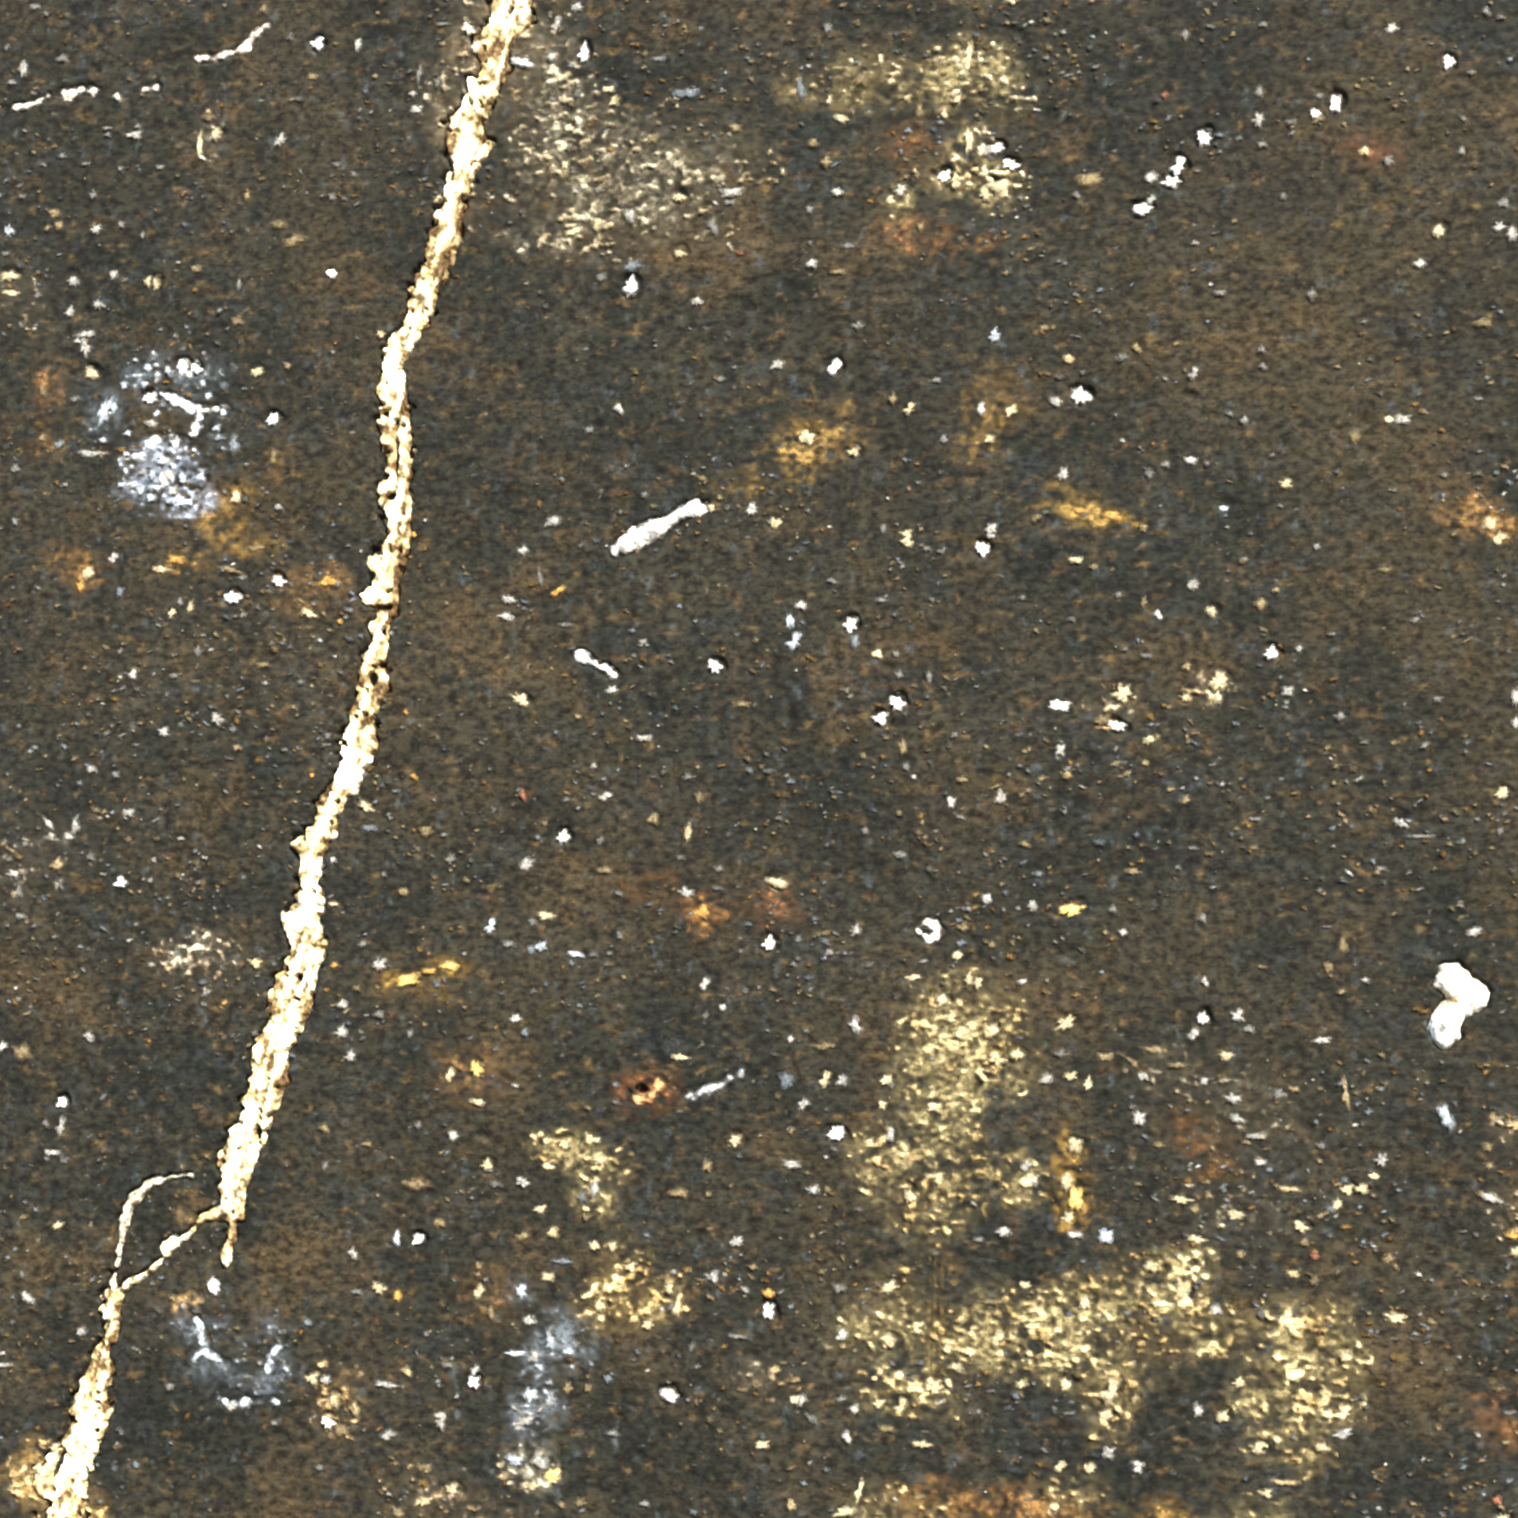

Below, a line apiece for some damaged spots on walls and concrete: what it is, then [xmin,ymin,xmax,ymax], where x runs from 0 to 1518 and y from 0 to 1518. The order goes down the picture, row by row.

water stain [117,332,226,518]
crack [9,0,537,1518]